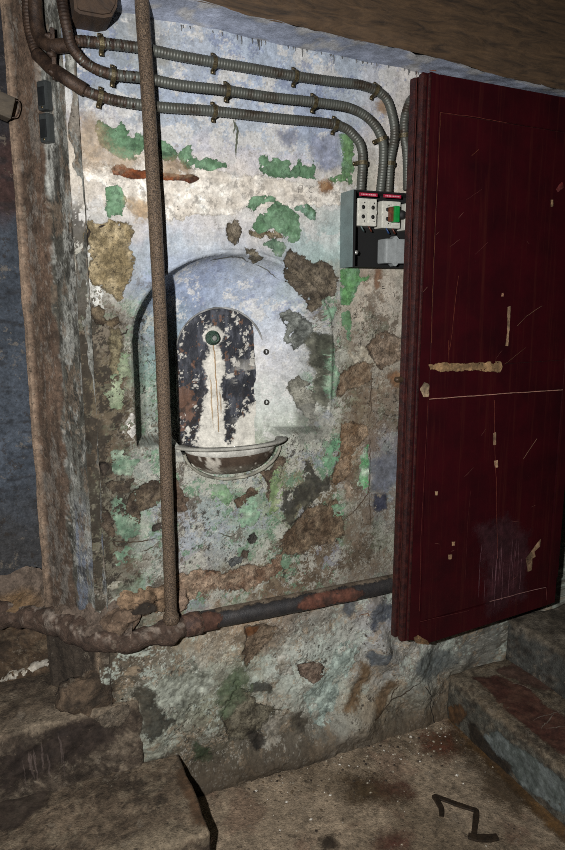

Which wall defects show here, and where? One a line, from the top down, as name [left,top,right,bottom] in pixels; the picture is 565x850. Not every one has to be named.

peeling [95,120,144,161]
corrosion [111,164,146,179]
corrosion [160,173,199,184]
peeling [158,140,227,171]
peeling [258,155,316,180]
flaking render [83,184,136,302]
flaking render [226,195,401,420]
leakage [314,333,334,387]
flaking render [176,455,346,601]
corrosion [201,611,223,632]
leakage [131,687,176,743]
crack [378,681,435,723]